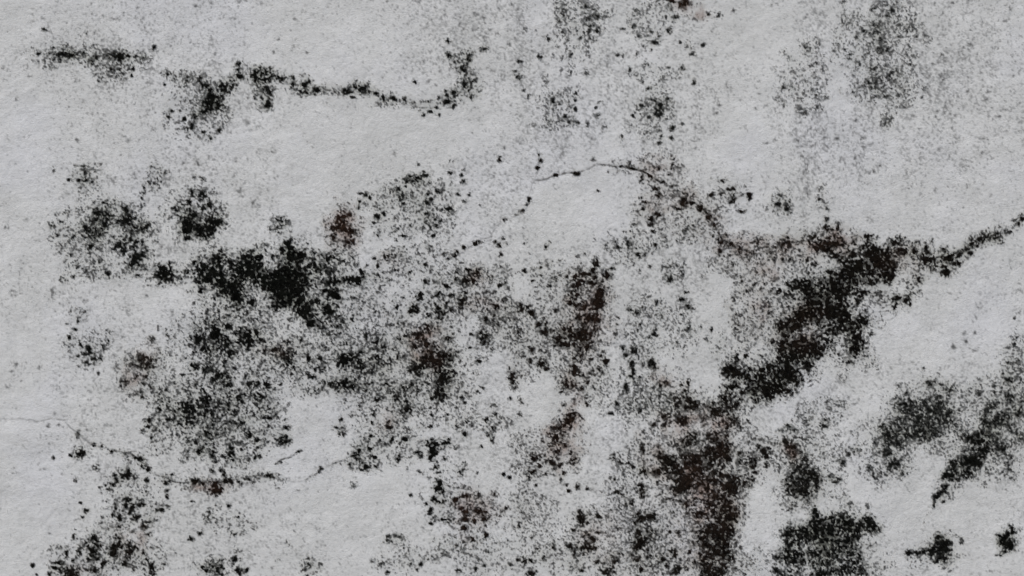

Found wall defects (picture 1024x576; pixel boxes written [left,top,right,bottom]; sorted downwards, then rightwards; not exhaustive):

crack [442,197,531,260]
crack [535,153,753,254]
damp [30,160,1024,576]
crack [110,417,341,502]